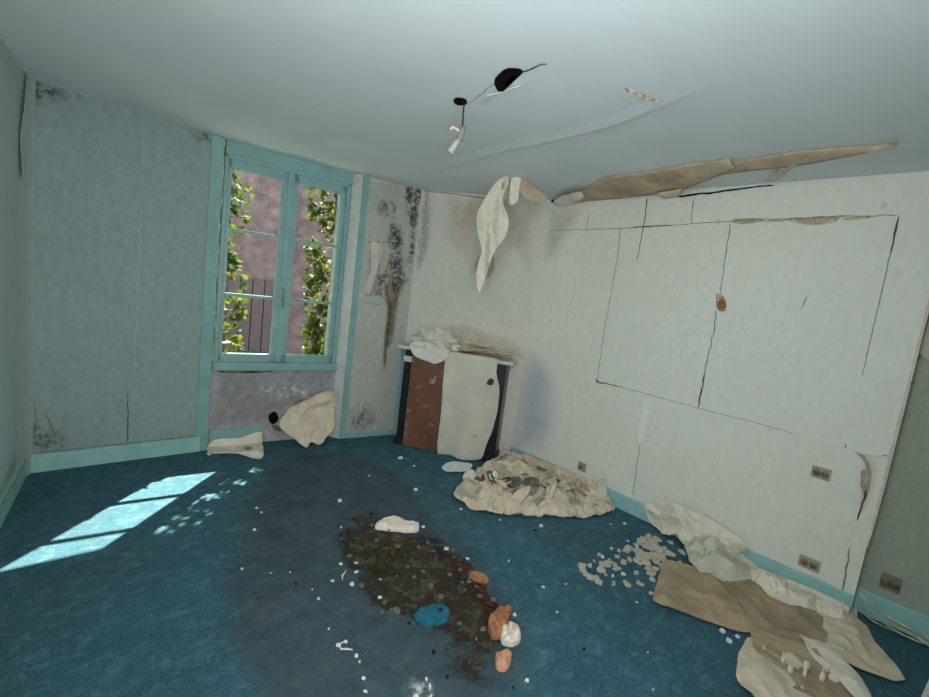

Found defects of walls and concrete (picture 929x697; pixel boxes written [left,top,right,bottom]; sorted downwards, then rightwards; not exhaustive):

leakage [376,188,428,362]
leakage [439,192,487,269]
peeling [474,177,509,293]
rust [716,293,726,311]
crack [552,185,899,493]
peeling [844,419,894,456]